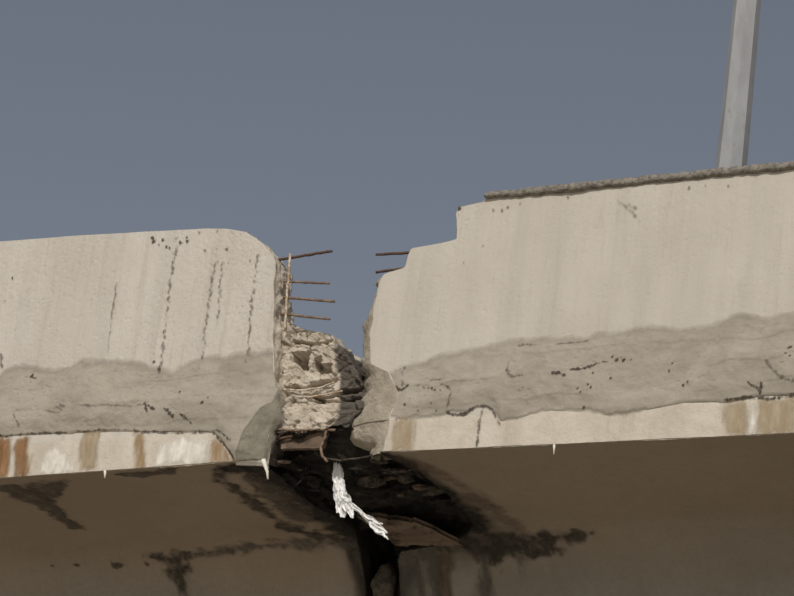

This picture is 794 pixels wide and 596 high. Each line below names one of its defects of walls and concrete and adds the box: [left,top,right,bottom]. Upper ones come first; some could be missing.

corrosion [0,438,29,478]
damp [0,440,83,530]
corrosion [80,430,100,468]
corrosion [135,434,145,468]
damp [145,464,365,592]
spalling [274,250,445,500]
damp [398,489,593,596]
corrosion [725,397,794,435]